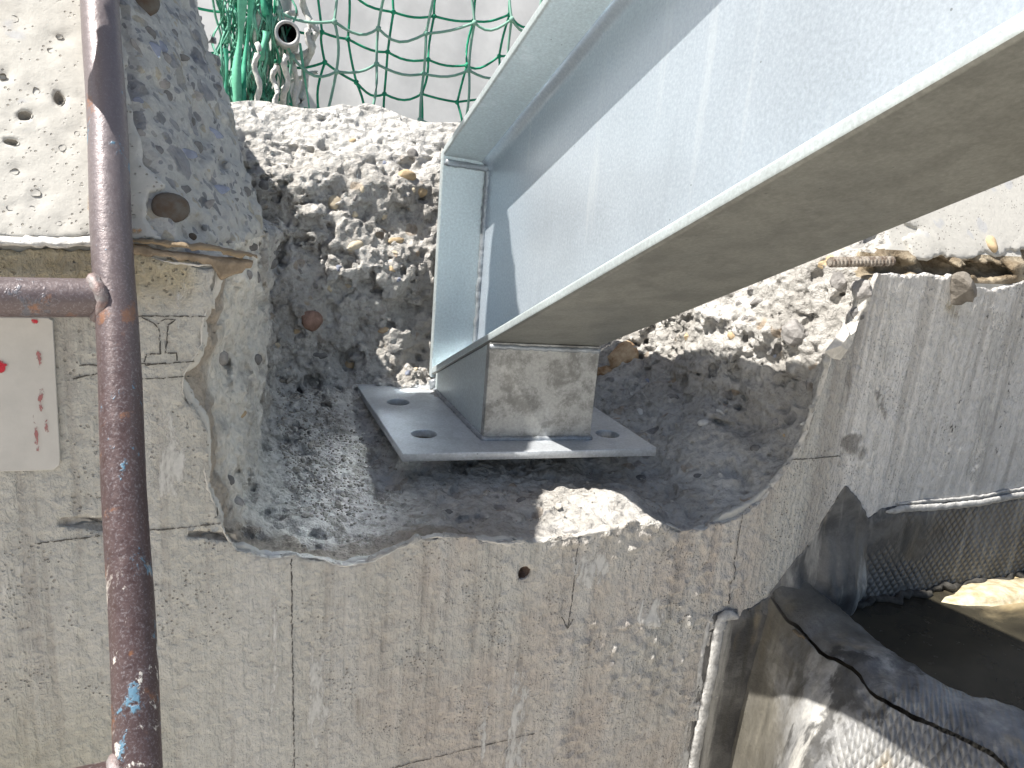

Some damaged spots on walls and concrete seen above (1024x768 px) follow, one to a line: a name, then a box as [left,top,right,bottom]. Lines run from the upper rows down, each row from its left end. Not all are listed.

spalling [119,0,896,567]